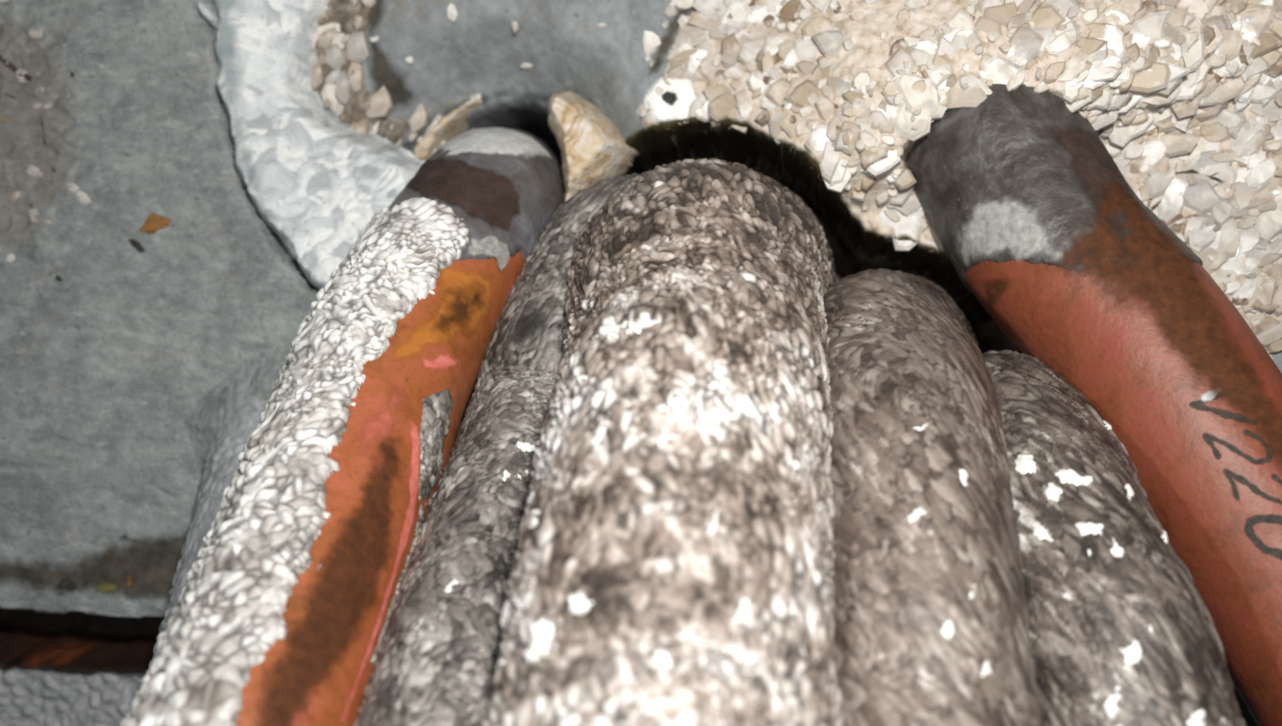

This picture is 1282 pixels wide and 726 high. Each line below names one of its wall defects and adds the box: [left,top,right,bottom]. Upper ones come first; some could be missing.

leakage [0,535,186,597]